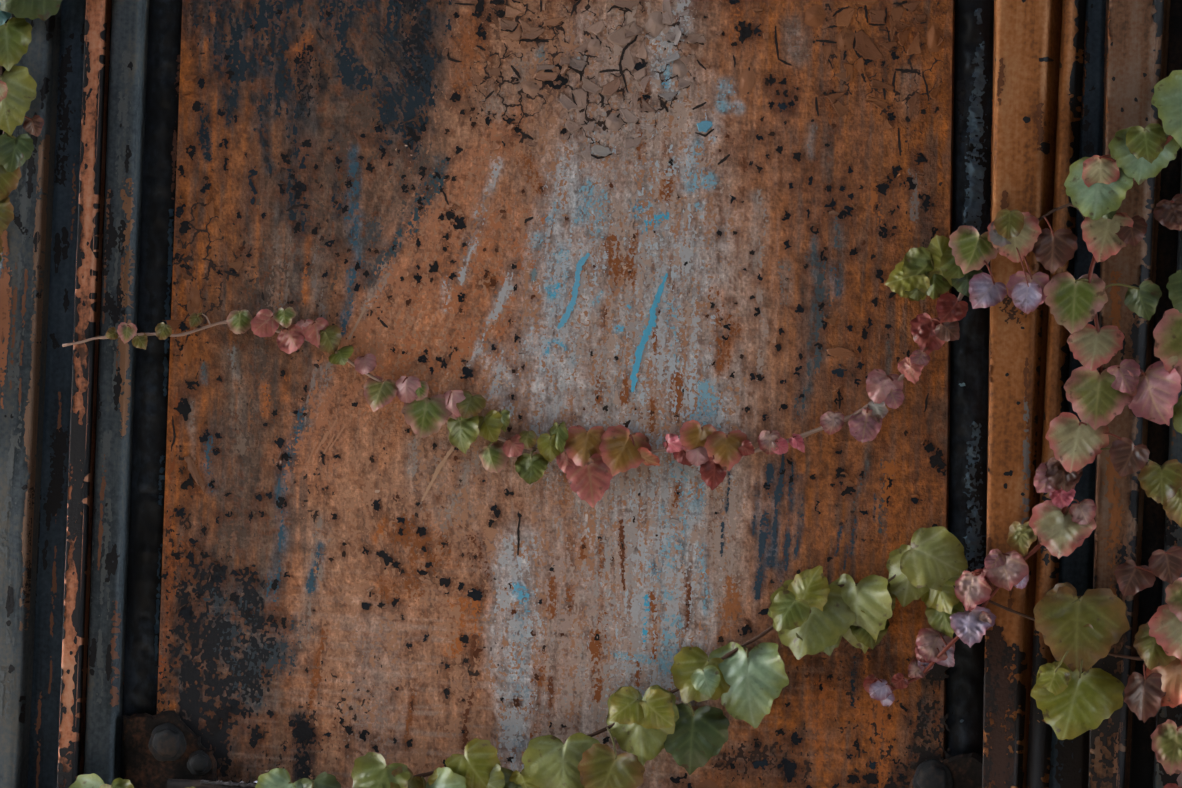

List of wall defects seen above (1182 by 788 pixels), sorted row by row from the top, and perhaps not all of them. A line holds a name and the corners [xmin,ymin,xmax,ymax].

peeling [887,107,939,122]
rust [102,178,135,437]
rust [593,229,642,293]
peeling [358,0,804,770]
rust [648,372,683,435]
rust [569,519,626,591]
rust [260,628,374,777]
rust [372,490,511,752]
rust [513,630,555,753]
rust [587,595,608,703]
rust [635,591,658,687]
rust [810,660,907,788]